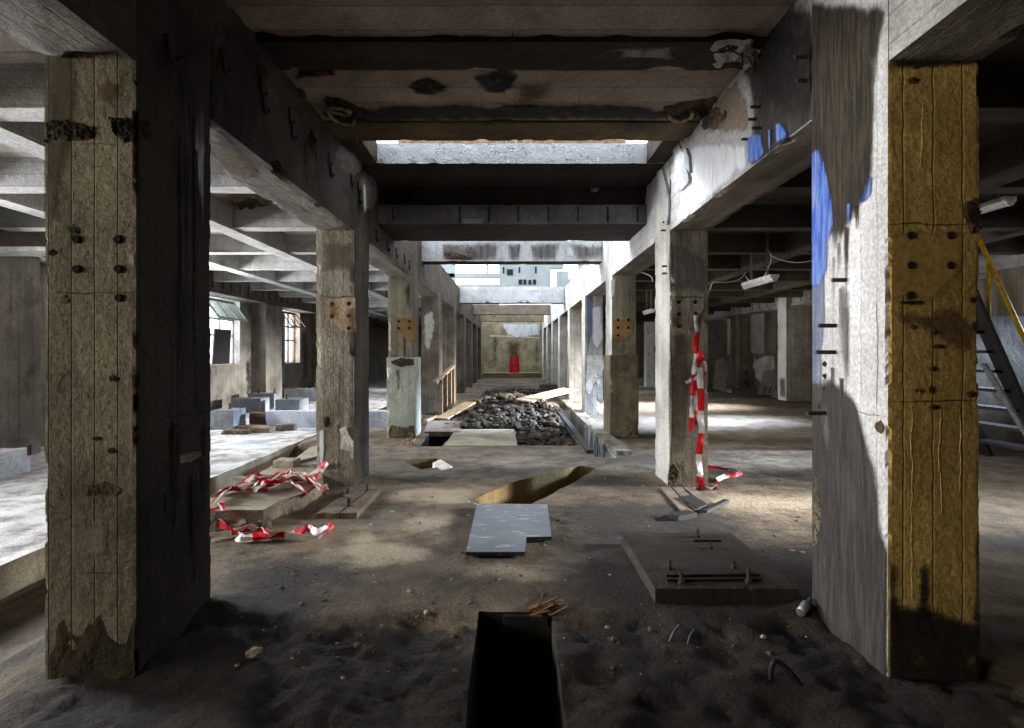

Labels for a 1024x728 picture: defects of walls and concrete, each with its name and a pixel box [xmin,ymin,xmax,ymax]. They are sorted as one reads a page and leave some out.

spalling [710,39,761,75]
water stain [409,78,446,95]
water stain [475,70,551,108]
spalling [43,118,94,143]
spalling [108,117,134,143]
spalling [50,613,135,679]